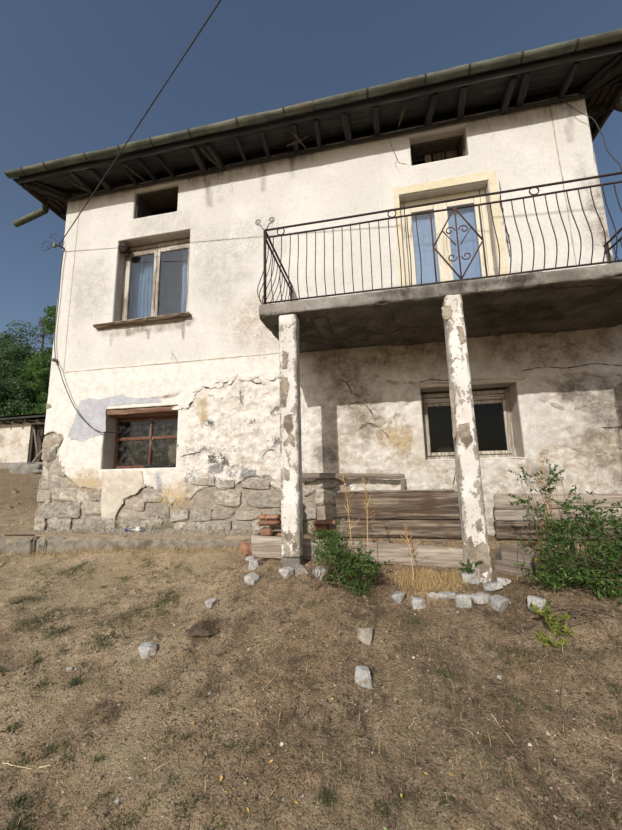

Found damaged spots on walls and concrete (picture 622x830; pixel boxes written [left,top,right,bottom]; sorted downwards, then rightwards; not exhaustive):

peeling [442,305,453,319]
crack [522,363,621,371]
flaking render [172,350,295,454]
crack [339,379,389,438]
peeling [450,390,473,447]
flaking render [33,394,298,555]
flaking render [302,478,350,534]
peeling [464,519,490,574]